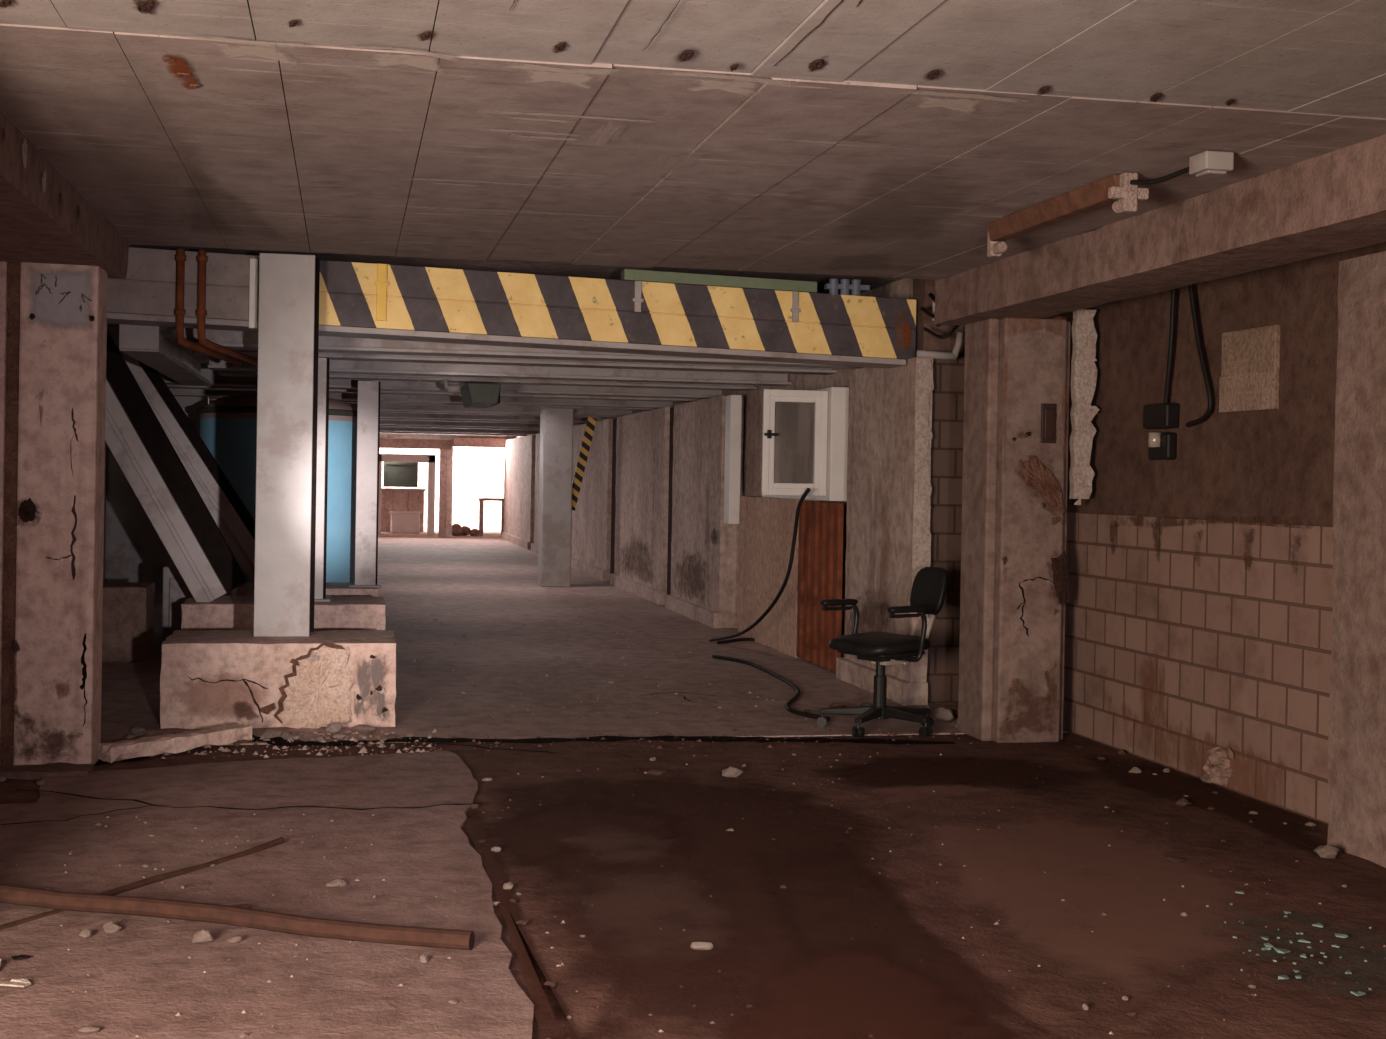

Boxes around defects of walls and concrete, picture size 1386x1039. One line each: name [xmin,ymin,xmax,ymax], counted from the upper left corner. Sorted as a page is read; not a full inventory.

crack [643,0,680,51]
crack [774,0,862,66]
corrosion [162,56,200,89]
peeling [1018,309,1100,525]
crack [0,676,956,825]